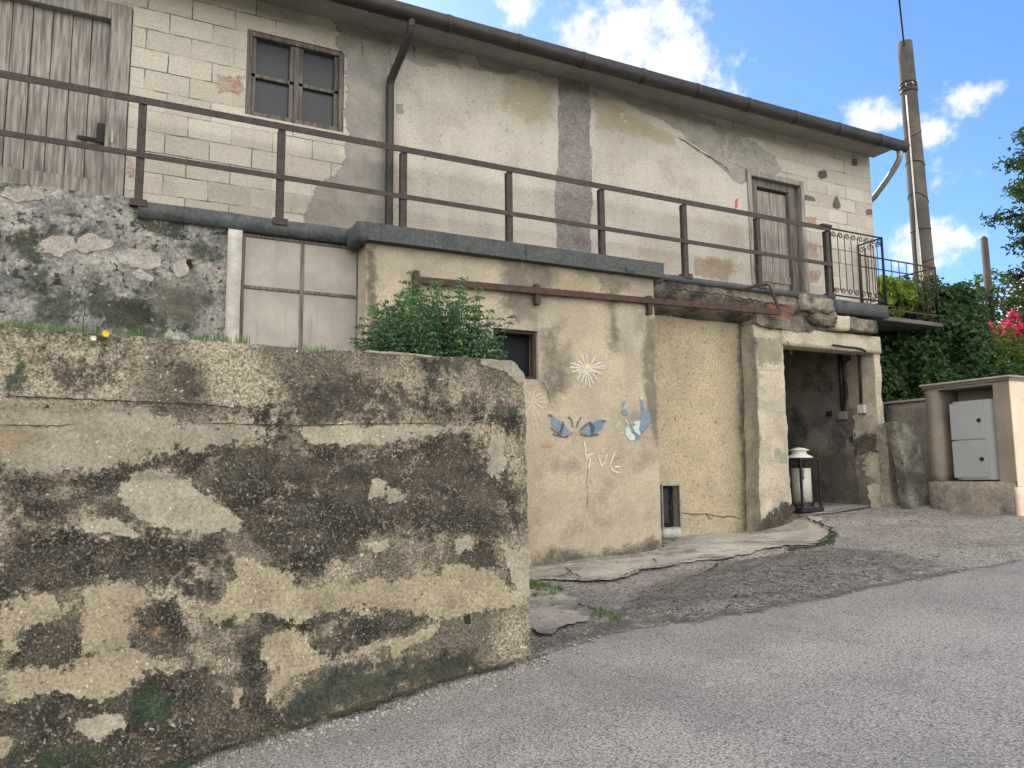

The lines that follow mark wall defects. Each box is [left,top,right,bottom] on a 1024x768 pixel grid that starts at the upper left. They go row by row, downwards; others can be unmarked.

flaking render [217,74,245,95]
crack [678,137,728,170]
water stain [11,220,51,270]
water stain [133,216,200,240]
water stain [101,292,155,334]
water stain [505,264,627,321]
water stain [28,336,131,398]
water stain [643,319,658,433]
crack [1,395,441,428]
water stain [0,349,527,768]
crack [559,512,907,611]